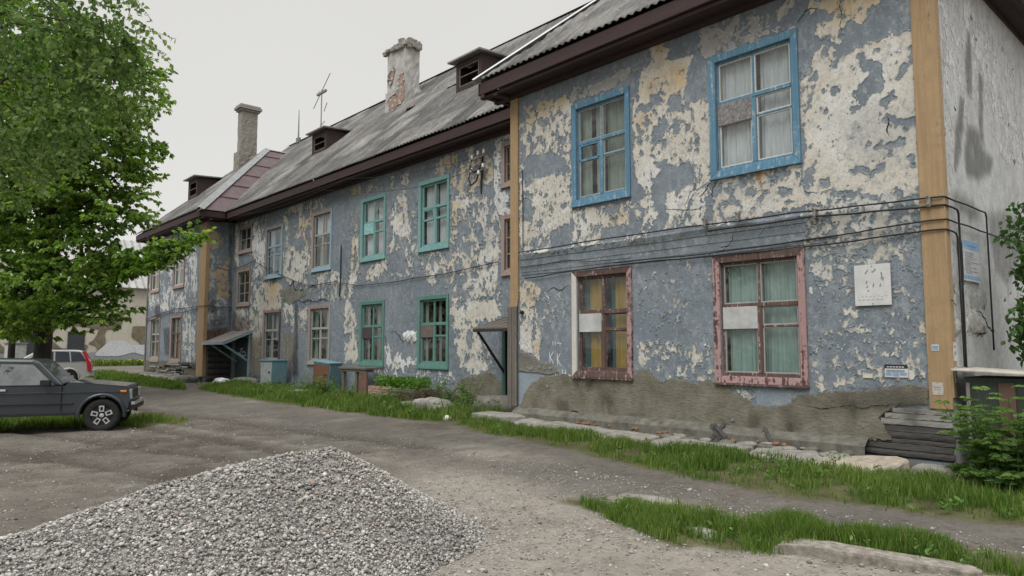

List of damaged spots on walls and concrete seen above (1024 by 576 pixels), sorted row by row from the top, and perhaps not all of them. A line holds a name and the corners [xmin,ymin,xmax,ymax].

peeling [149,0,929,441]
damp [955,34,993,177]